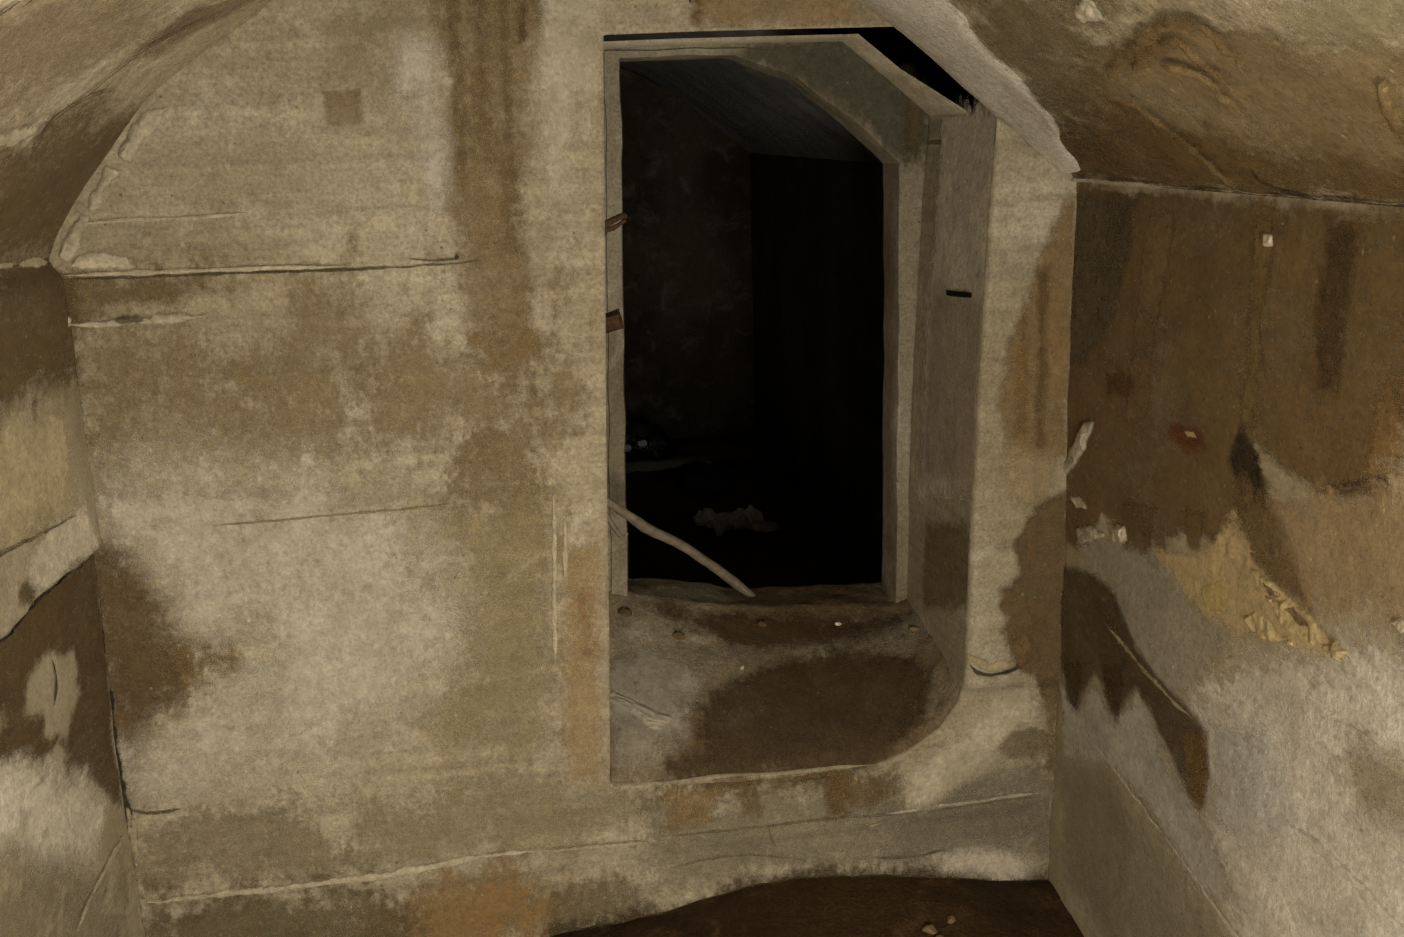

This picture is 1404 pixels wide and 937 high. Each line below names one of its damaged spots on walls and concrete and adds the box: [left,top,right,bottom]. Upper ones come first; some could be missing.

crack [33,10,222,145]
damp [442,0,546,137]
peeling [1074,0,1105,23]
damp [0,99,205,426]
damp [1000,18,1404,898]
crack [0,515,77,557]
crack [0,556,92,642]
damp [0,279,584,872]
crack [51,660,59,705]
crack [109,689,179,840]
damp [658,601,932,823]